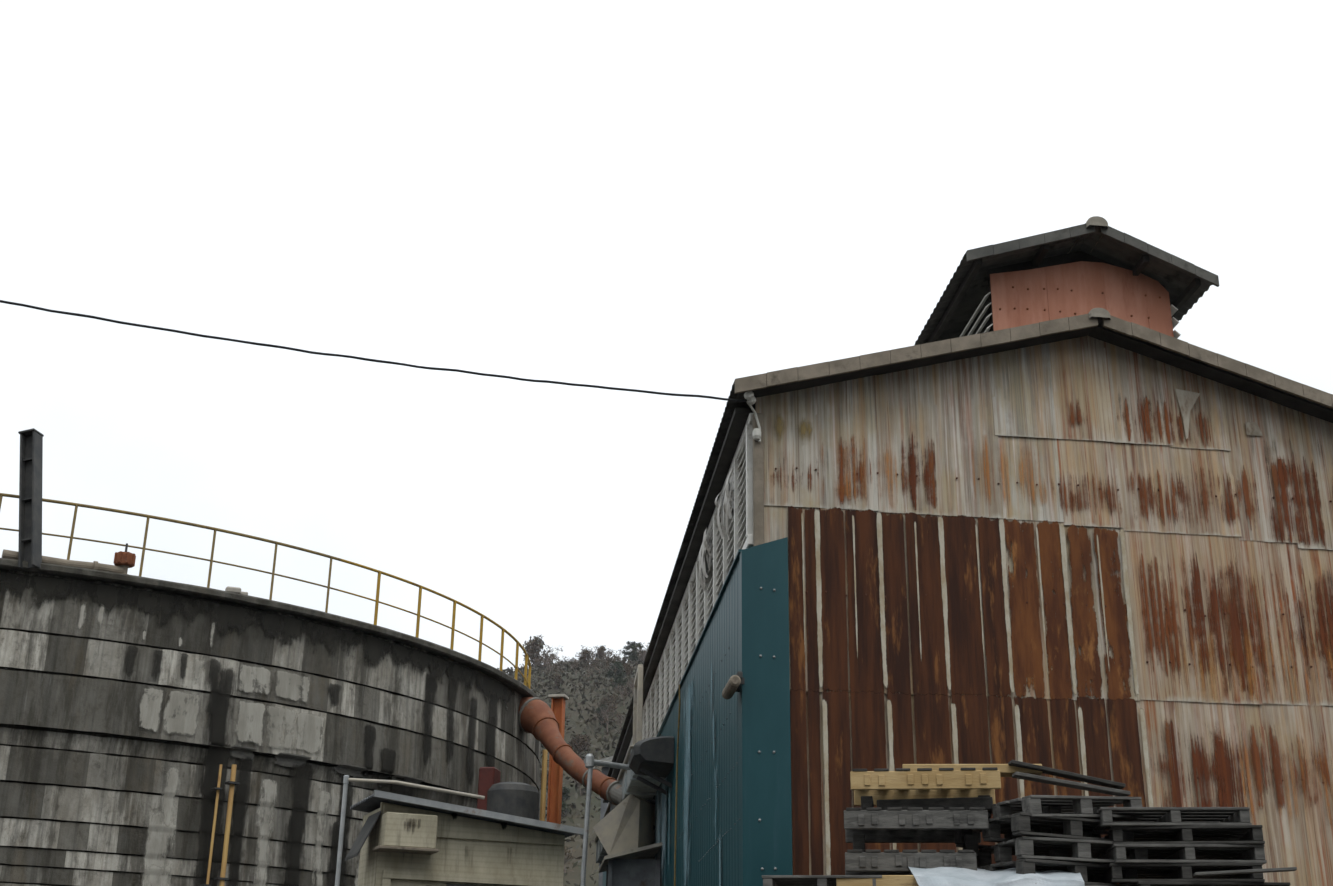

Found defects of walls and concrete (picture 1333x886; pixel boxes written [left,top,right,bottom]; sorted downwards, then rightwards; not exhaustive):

corrosion [1070,401,1088,427]
corrosion [1117,396,1211,445]
corrosion [773,452,823,490]
corrosion [788,432,1333,875]
water stain [0,571,515,886]